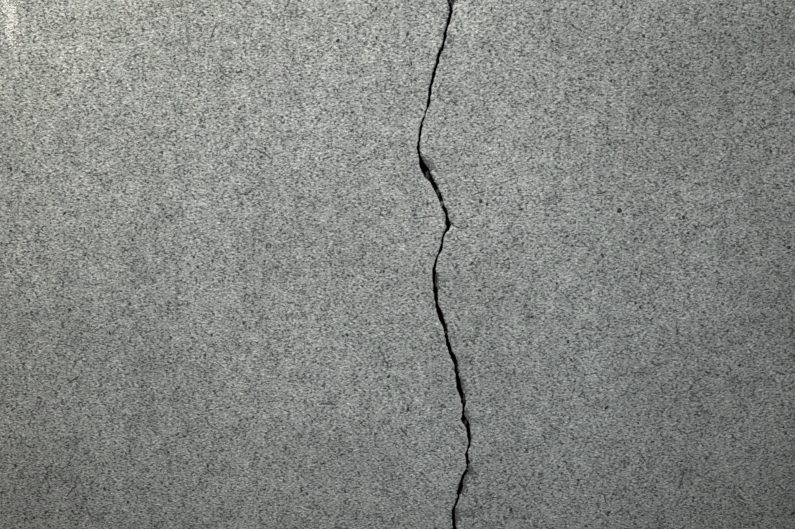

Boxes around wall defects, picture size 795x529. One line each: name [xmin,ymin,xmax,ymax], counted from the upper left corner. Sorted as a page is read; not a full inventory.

crack [417,0,477,529]